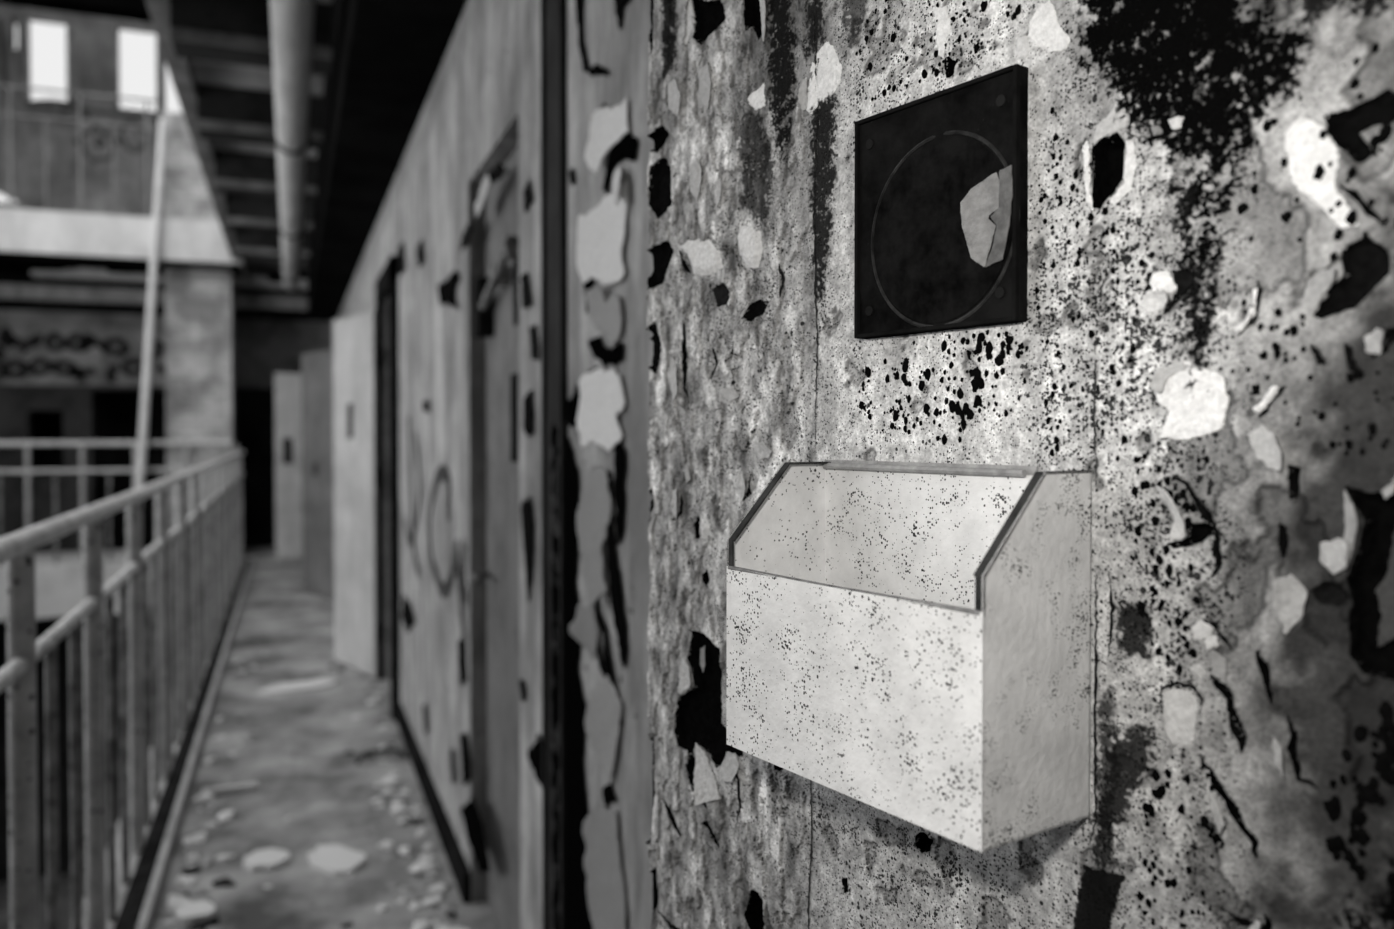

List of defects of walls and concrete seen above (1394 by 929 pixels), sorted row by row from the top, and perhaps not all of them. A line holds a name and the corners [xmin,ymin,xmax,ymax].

damp [1038,133,1154,321]
spalling [1082,91,1137,211]
peeling [1151,116,1184,136]
damp [1071,0,1393,396]
spalling [1285,89,1394,319]
peeling [527,78,681,929]
damp [858,330,1136,457]
damp [1115,435,1213,673]
peeling [1248,425,1301,499]
damp [1283,400,1337,427]
spalling [1272,480,1394,680]
damp [1329,423,1389,456]